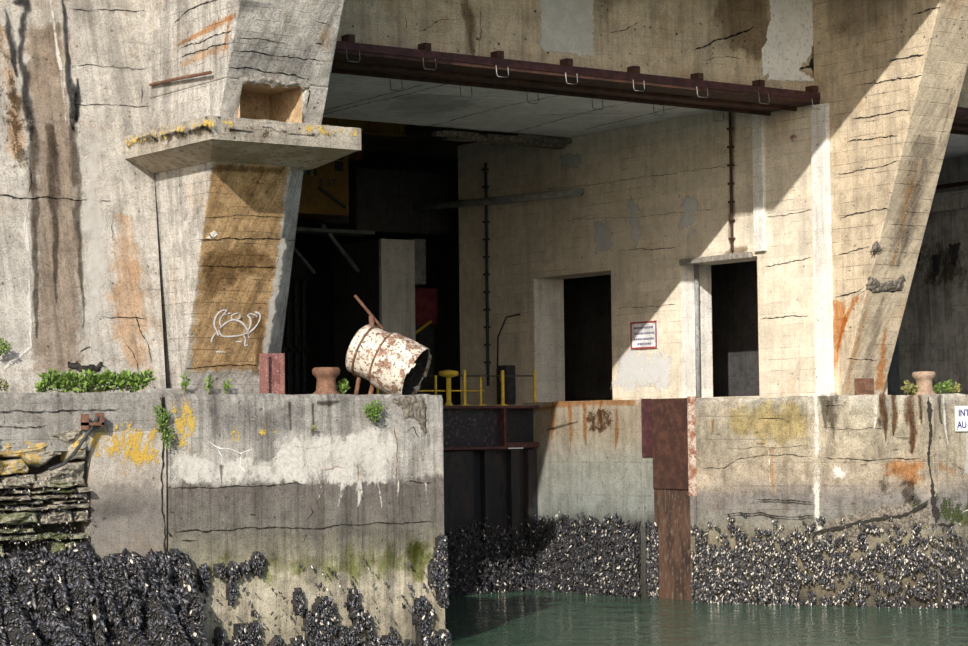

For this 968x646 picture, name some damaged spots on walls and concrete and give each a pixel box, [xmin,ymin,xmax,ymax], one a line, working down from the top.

damp [5,0,36,168]
damp [50,0,81,130]
crack [174,0,216,23]
crack [181,20,327,79]
peeling [761,0,814,82]
crack [1,165,113,240]
damp [3,201,38,370]
peeling [916,240,968,287]
damp [168,426,405,507]
rust [585,408,613,436]
crack [700,395,968,528]
rust [873,393,922,453]